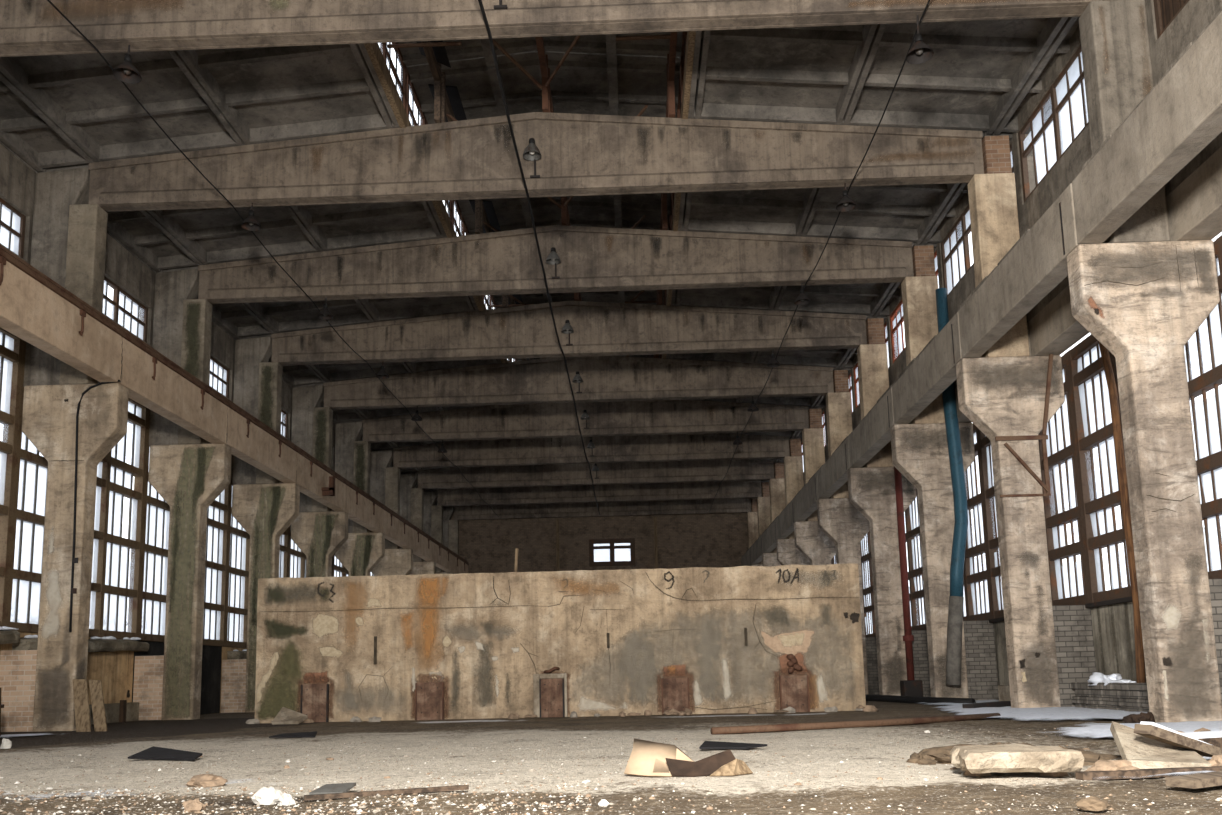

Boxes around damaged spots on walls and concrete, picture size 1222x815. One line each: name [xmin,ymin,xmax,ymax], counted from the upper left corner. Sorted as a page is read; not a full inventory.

leakage [193,447,206,512]
leakage [252,487,280,624]
leakage [573,606,850,701]